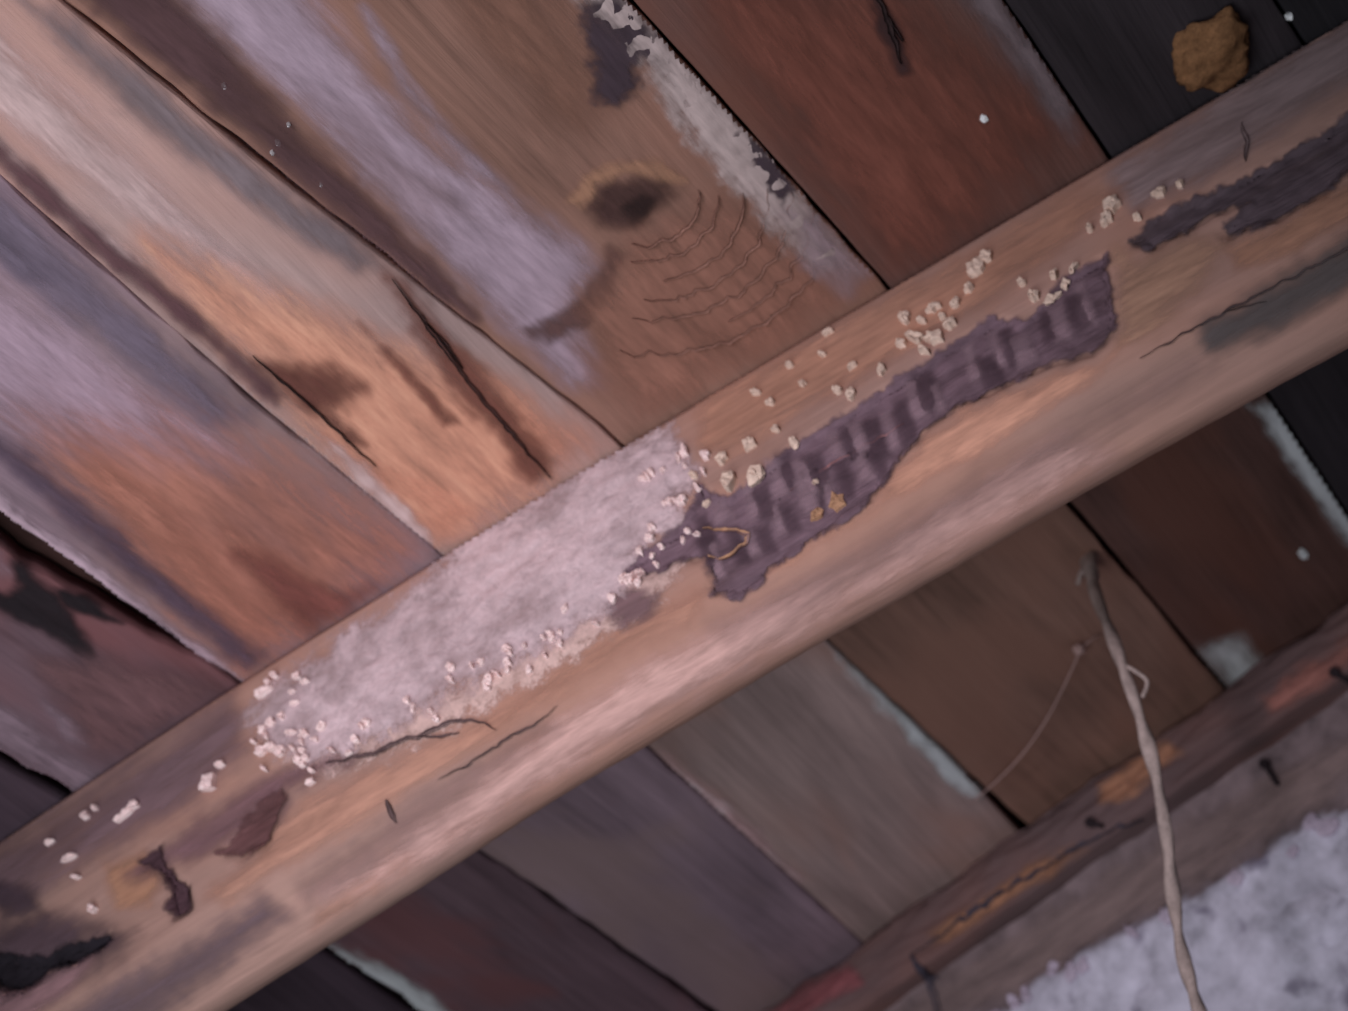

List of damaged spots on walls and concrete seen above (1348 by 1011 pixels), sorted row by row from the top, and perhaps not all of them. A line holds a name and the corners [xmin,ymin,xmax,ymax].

water stain [1113,23,1348,206]
water stain [0,0,859,672]
crack [1139,247,1348,359]
water stain [0,707,239,1011]
water stain [135,762,331,874]
crack [325,709,553,780]
water stain [330,447,1099,893]
water stain [81,903,278,1011]